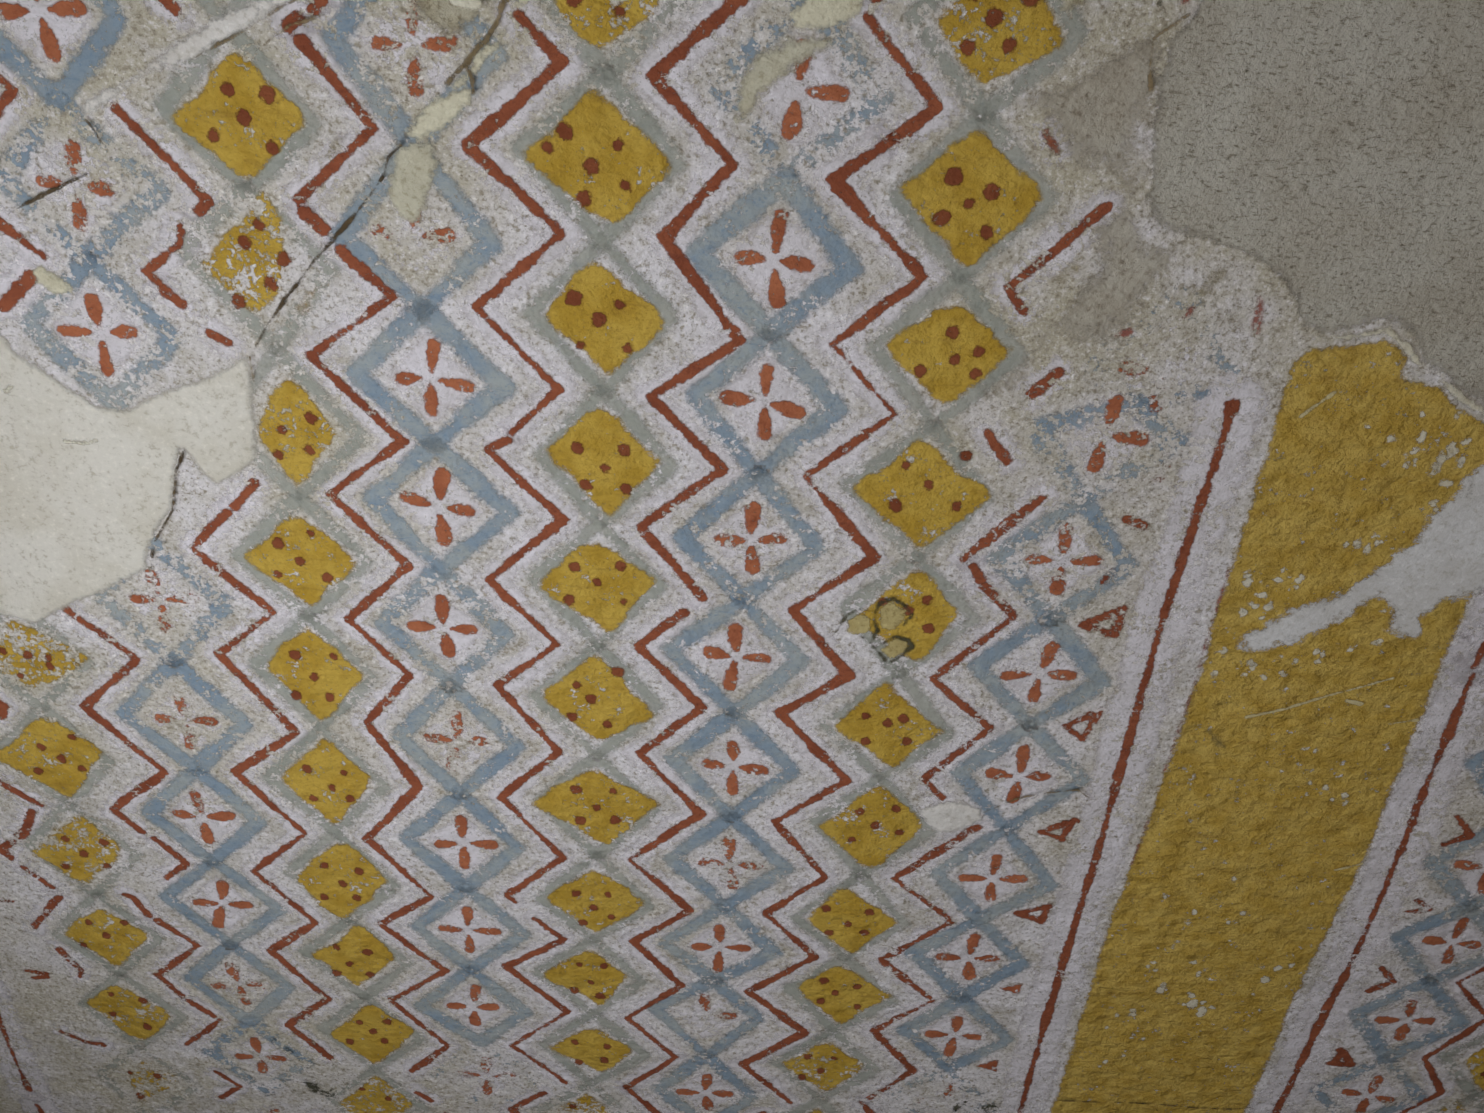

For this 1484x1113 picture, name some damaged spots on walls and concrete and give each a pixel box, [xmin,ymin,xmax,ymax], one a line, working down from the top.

crack [196,0,320,56]
crack [445,0,529,94]
crack [249,144,402,379]
peeling [1381,411,1472,512]
peeling [1343,534,1394,553]
peeling [1239,567,1304,620]
spalling [835,597,915,663]
peeling [1242,648,1325,681]
peeling [1302,747,1349,806]